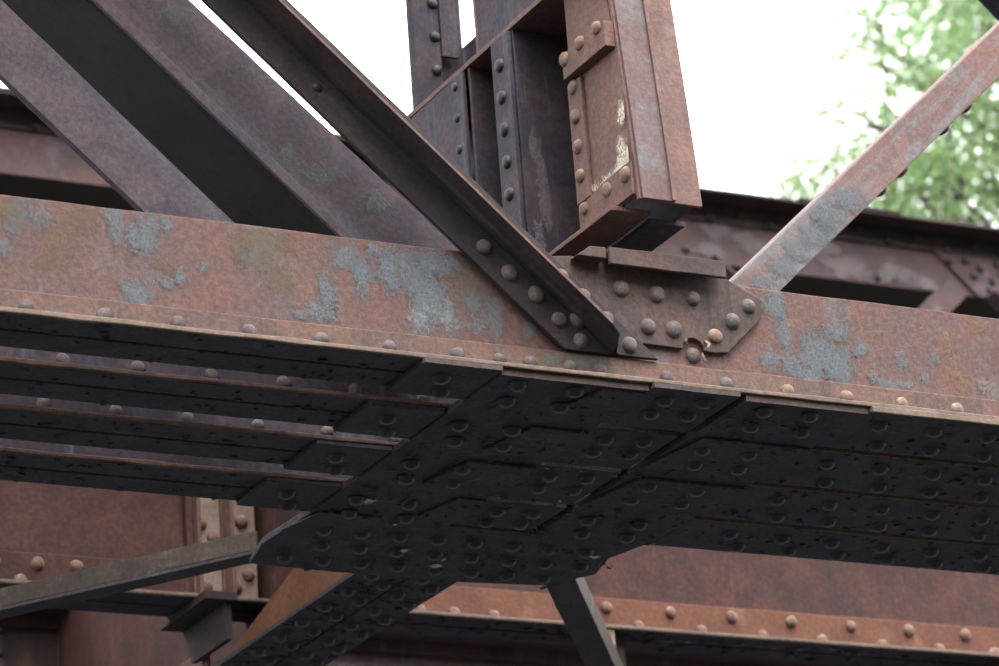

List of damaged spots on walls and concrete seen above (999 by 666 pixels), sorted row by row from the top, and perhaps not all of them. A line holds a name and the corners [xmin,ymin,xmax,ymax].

peeling [103,208,173,258]
peeling [288,242,504,342]
peeling [693,183,939,384]